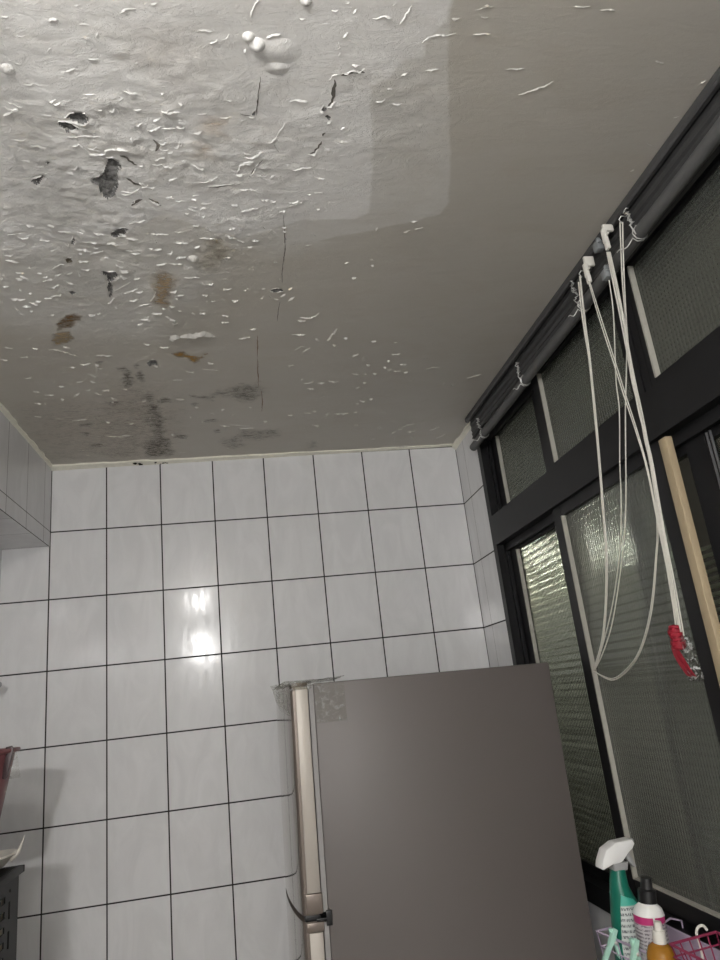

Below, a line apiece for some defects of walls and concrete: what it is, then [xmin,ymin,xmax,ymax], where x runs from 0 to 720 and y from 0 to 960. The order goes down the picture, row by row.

crack [310,70,365,154]
peeling [182,124,322,213]
spalling [0,91,259,349]
corrosion [52,315,80,344]
peeling [33,347,117,417]